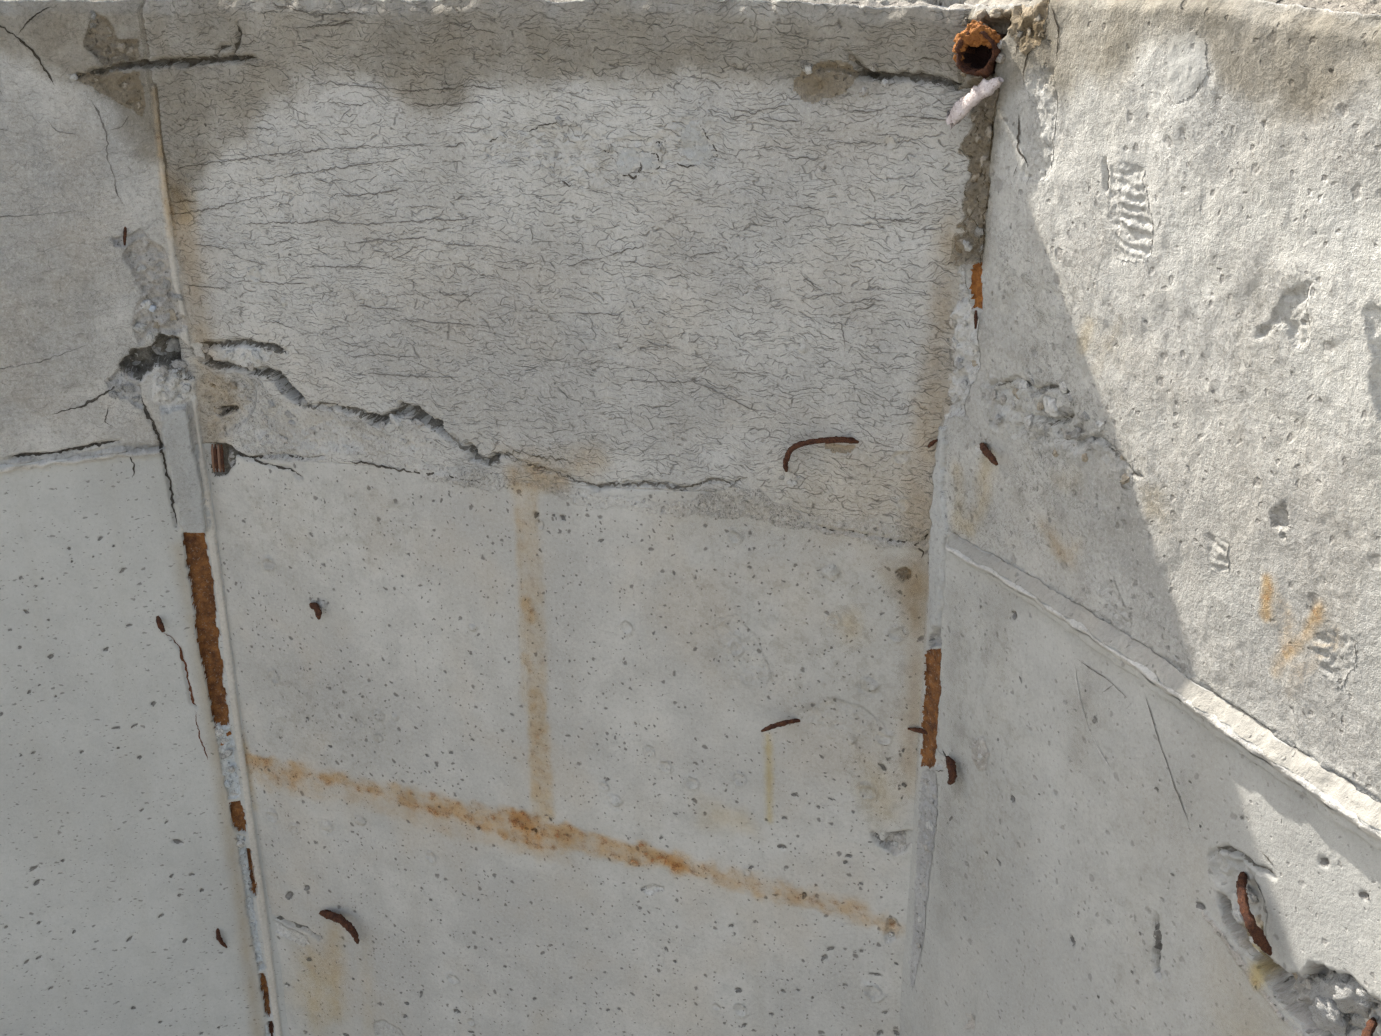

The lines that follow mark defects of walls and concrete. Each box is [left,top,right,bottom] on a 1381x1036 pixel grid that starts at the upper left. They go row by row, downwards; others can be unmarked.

crack [0,7,267,203]
crack [170,120,569,328]
crack [274,3,507,107]
crack [564,245,724,270]
crack [550,105,804,204]
crack [784,194,942,231]
crack [790,57,961,161]
crack [12,386,177,523]
crack [200,321,769,490]
peeling [105,229,927,550]
spalling [895,567,911,581]
spalling [1196,849,1381,1036]